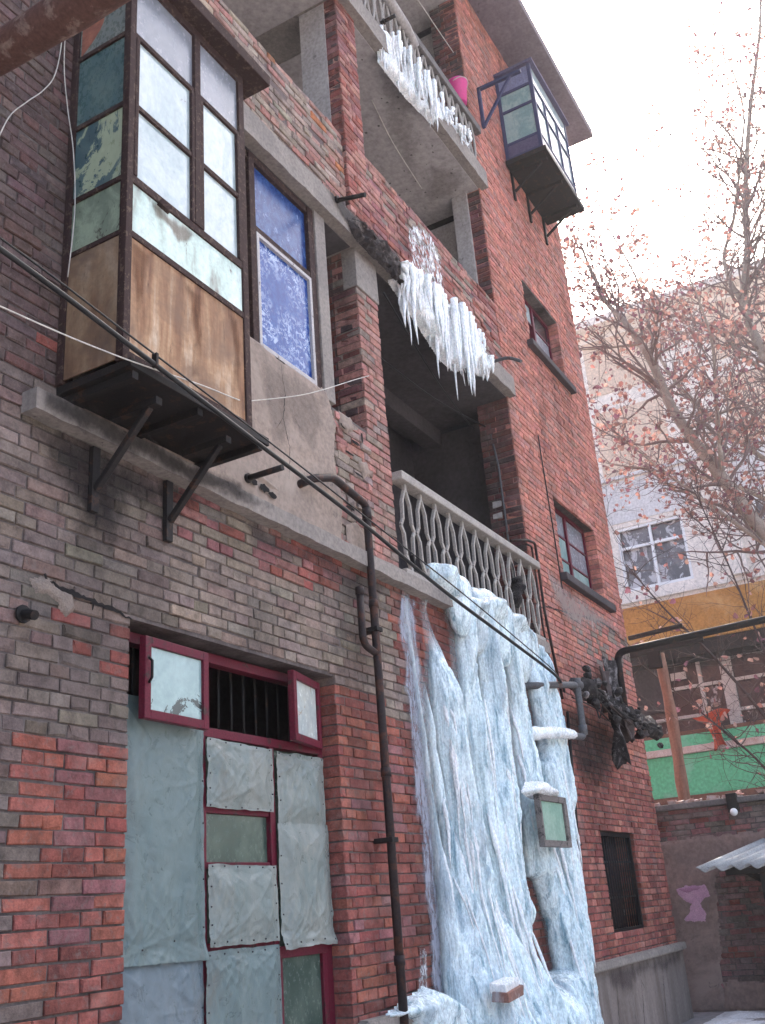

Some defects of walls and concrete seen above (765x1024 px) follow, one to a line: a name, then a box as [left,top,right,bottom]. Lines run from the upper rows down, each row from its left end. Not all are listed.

spalling [325,183,404,285]
crack [276,367,290,471]
flaking render [334,411,377,557]
crack [44,573,132,620]